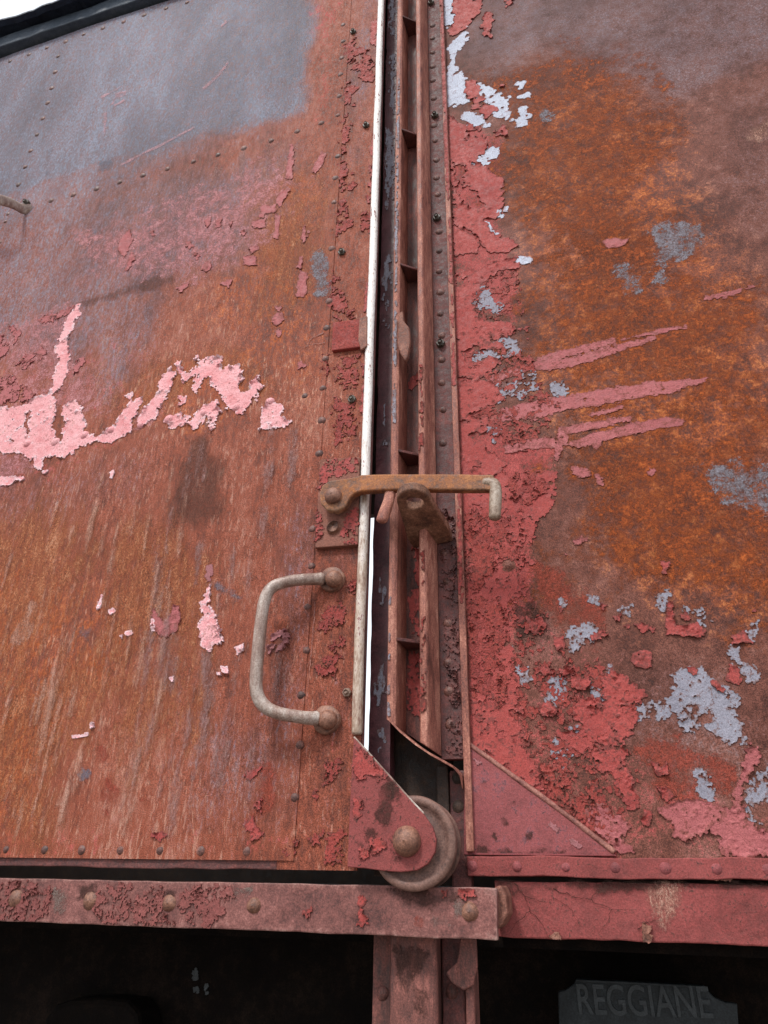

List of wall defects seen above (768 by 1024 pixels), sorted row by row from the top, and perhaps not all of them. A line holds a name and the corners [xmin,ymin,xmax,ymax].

peeling [204,144,295,267]
peeling [311,0,400,366]
peeling [0,475,25,487]
peeling [0,303,293,474]
rust [138,361,209,414]
peeling [439,0,768,858]
rust [472,51,768,611]
peeling [197,564,244,655]
rust [526,561,606,626]
rust [0,504,213,847]
rust [633,735,737,800]
peeling [92,882,235,929]